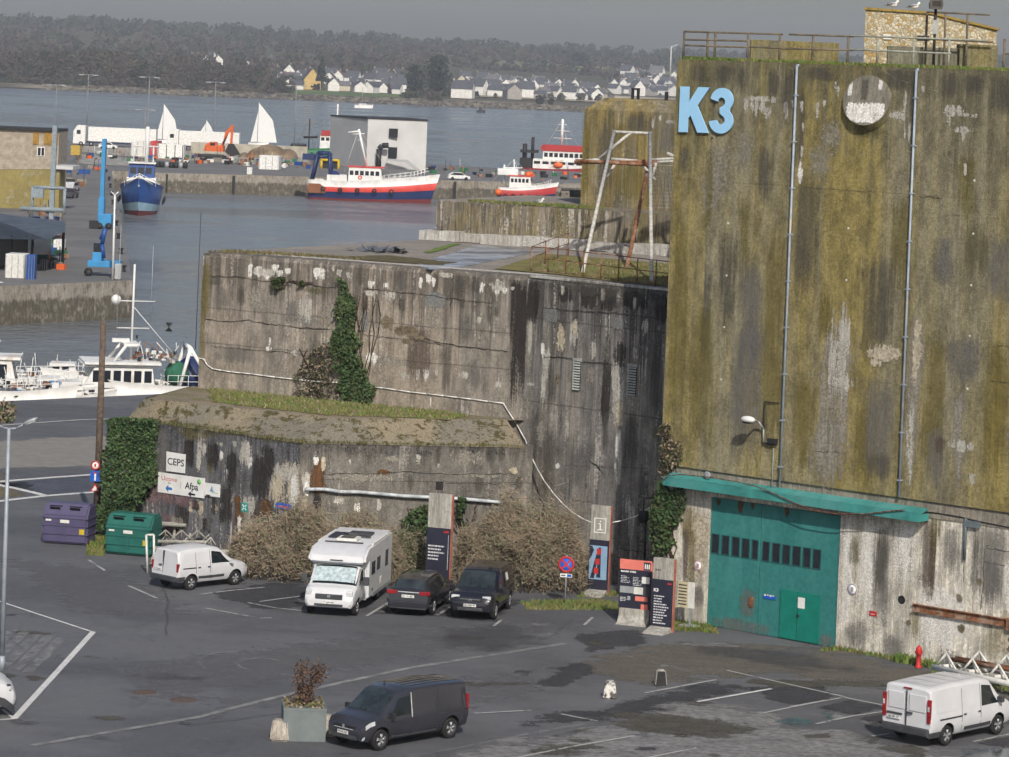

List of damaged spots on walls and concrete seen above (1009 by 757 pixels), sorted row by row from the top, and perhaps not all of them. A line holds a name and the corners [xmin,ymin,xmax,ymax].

leakage [717,65,844,275]
leakage [239,263,291,312]
leakage [313,264,396,332]
leakage [555,280,667,334]
leakage [418,245,590,496]
leakage [587,339,637,487]
leakage [810,301,853,489]
spalling [867,343,901,367]
leakage [160,440,276,533]
peeling [269,460,301,509]
corrosion [310,456,327,510]
leakage [841,518,971,664]